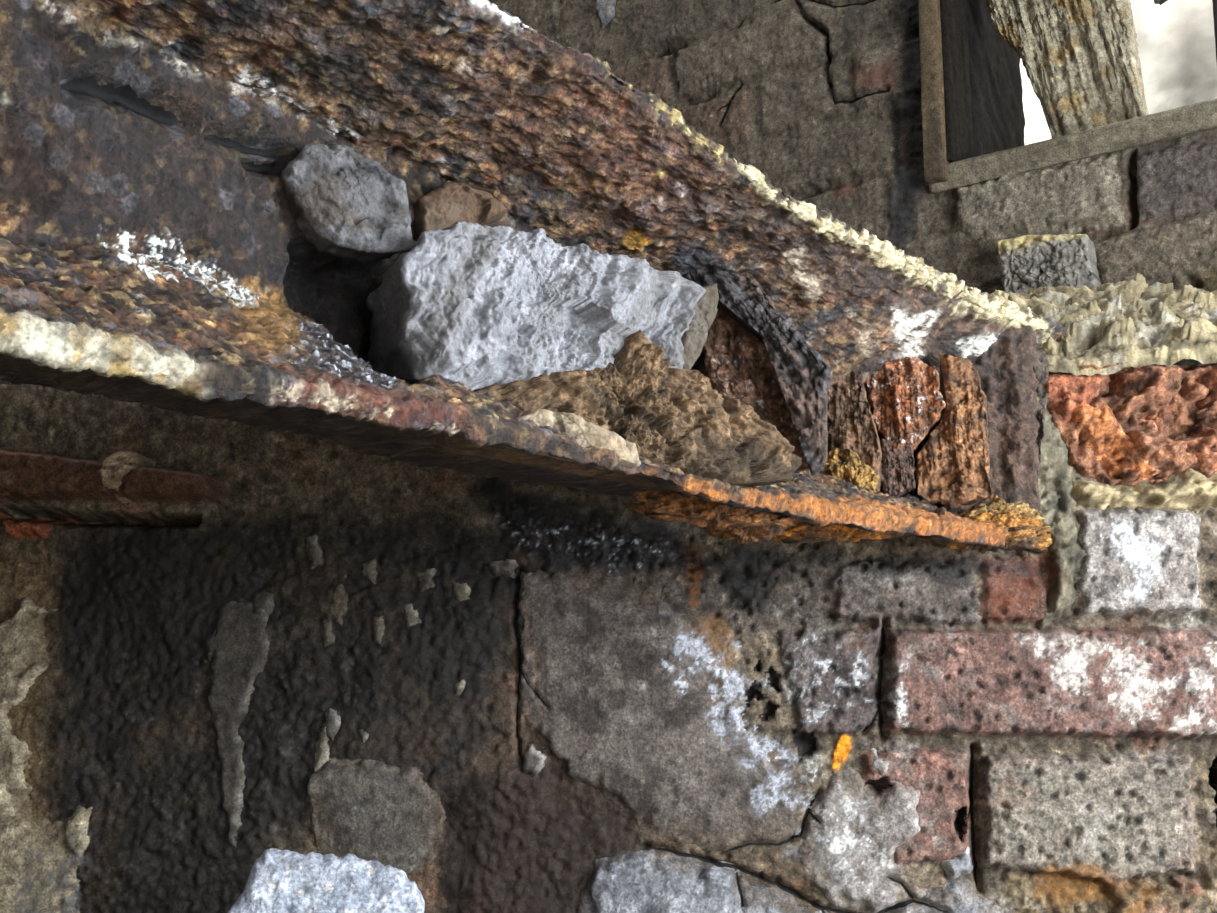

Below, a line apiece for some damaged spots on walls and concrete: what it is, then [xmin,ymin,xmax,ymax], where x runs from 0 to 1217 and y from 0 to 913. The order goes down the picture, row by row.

crack [775,0,890,104]
leakage [273,323,396,412]
rust [622,489,1052,554]
leakage [859,557,1048,583]
leakage [19,479,842,913]
crack [514,572,549,769]
crack [862,625,886,735]
leakage [663,634,893,887]
crack [646,790,945,913]
crack [959,747,978,887]